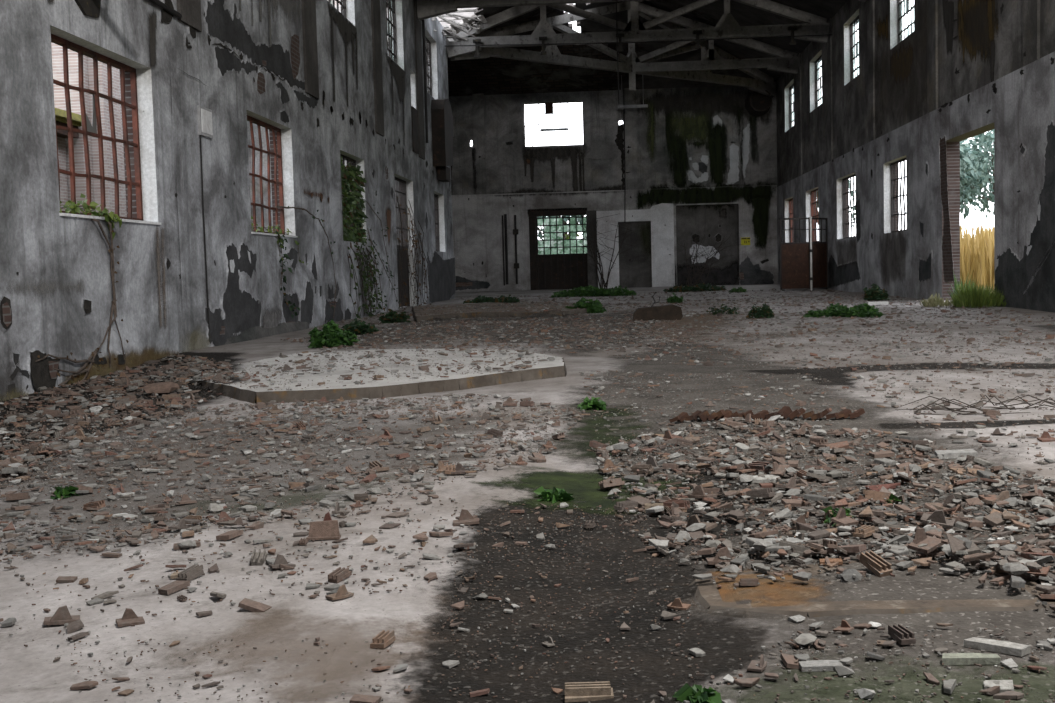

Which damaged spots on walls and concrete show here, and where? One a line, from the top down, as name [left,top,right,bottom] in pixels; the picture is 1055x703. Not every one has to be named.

flaking render [159,0,174,25]
peeling [183,0,404,158]
peeling [994,120,1055,313]
spalling [0,295,12,334]
peeling [203,241,262,346]
spalling [8,347,60,393]